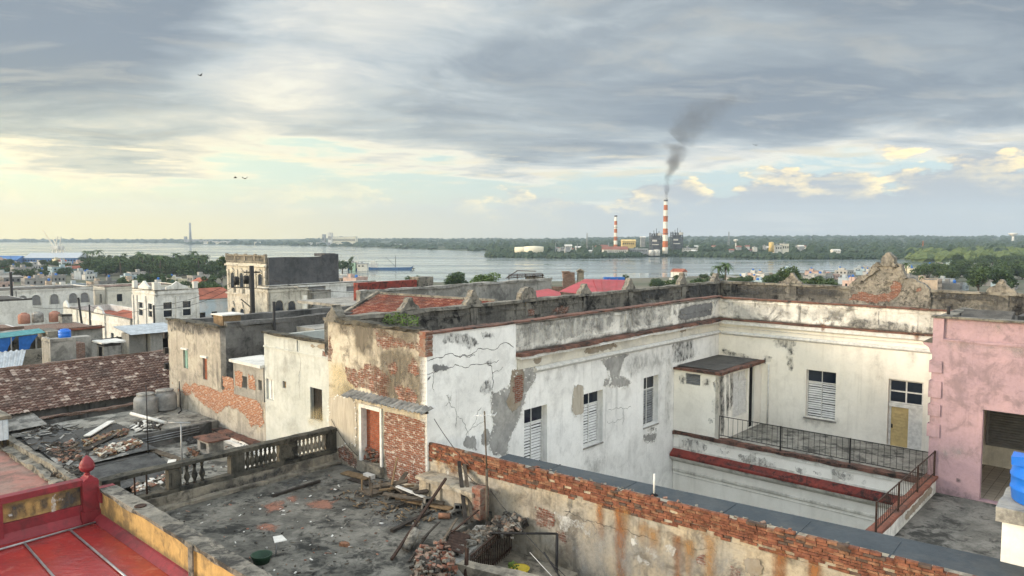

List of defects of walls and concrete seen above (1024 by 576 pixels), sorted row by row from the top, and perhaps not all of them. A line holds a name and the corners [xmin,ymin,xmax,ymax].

flaking render [172,370,264,428]
peeling [327,328,449,468]
crack [429,342,513,434]
peeling [480,358,542,457]
peeling [571,385,585,417]
peeling [584,343,631,389]
flaking render [384,412,425,484]
corrosion [615,509,626,576]